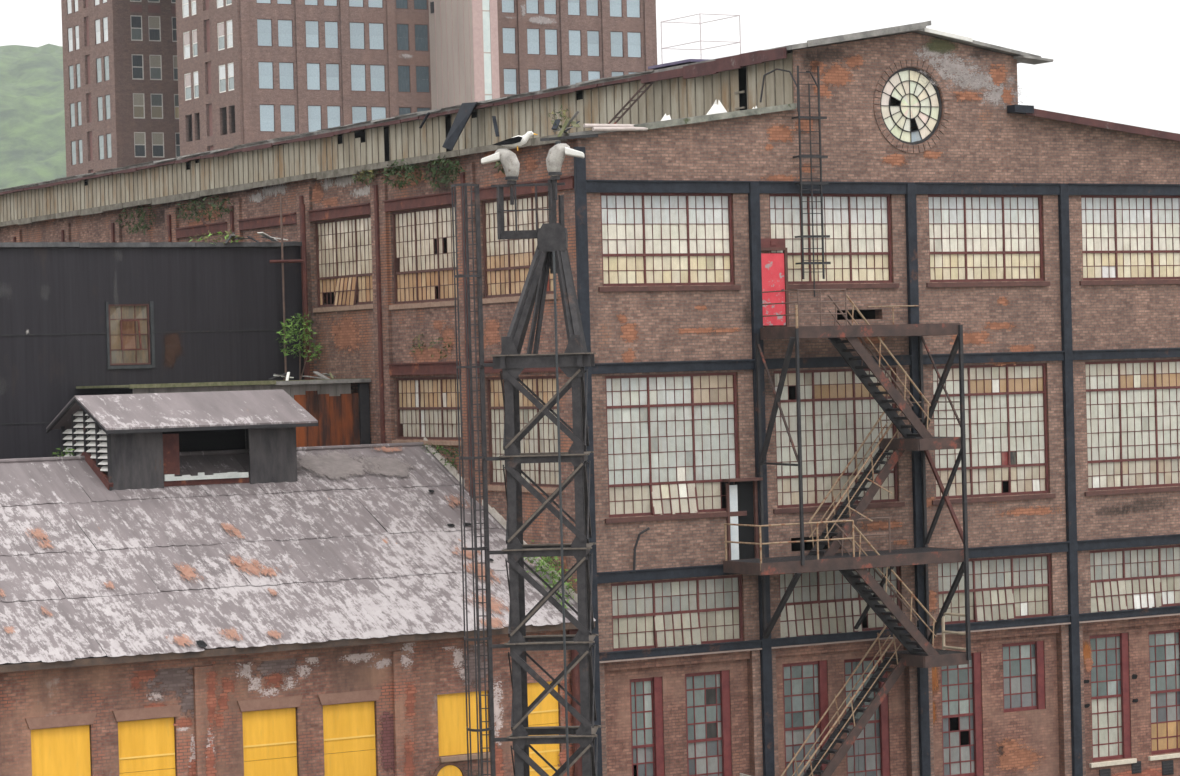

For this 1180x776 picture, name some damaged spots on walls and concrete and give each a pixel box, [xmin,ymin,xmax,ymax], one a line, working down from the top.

spalling [951,64,1014,106]
corrosion [294,391,360,447]